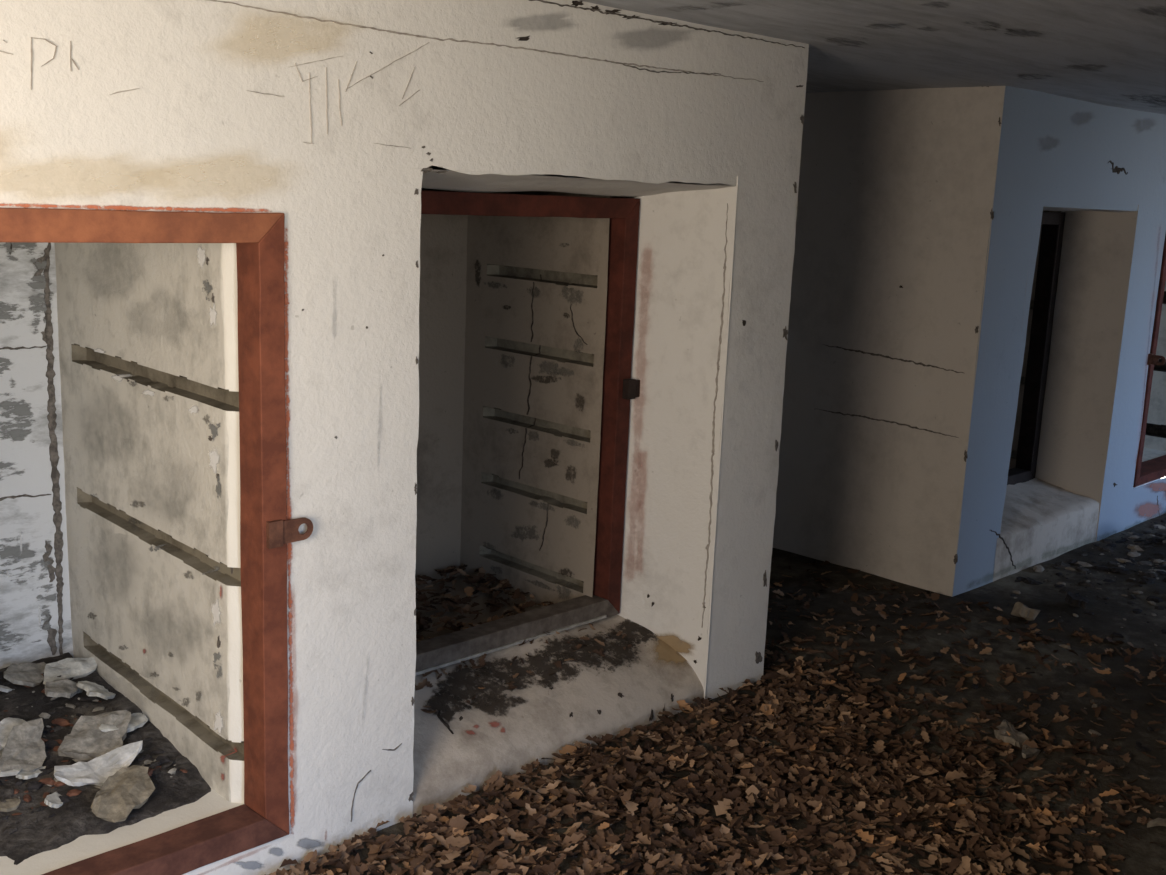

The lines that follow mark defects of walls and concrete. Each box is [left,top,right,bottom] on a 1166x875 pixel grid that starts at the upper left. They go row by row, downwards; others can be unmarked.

crack [208,0,764,82]
spalling [0,242,64,655]